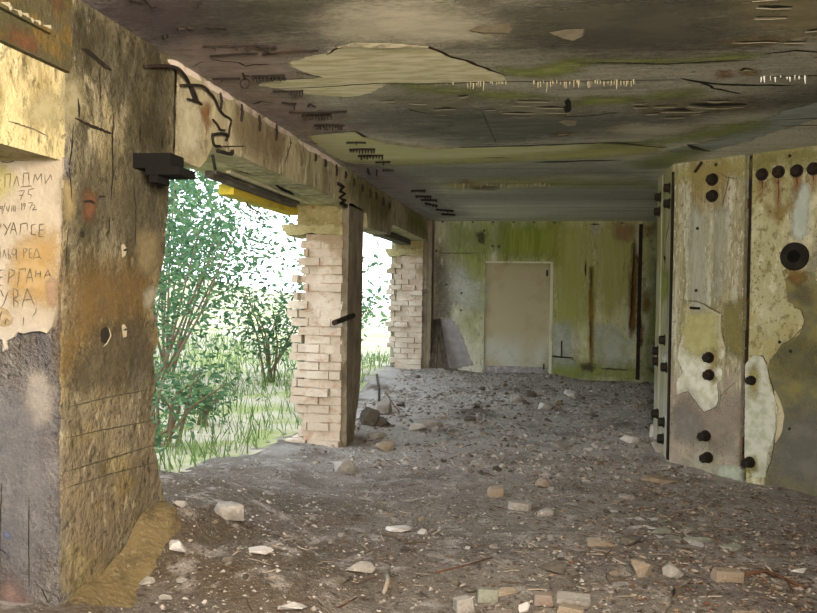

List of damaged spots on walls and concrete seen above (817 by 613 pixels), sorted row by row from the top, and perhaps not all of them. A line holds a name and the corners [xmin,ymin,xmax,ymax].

peeling [549,28,585,41]
water stain [97,0,817,157]
flaking render [143,43,666,209]
corrosion [766,176,800,218]
water stain [435,265,482,317]
water stain [552,324,574,364]
peeling [676,302,776,478]